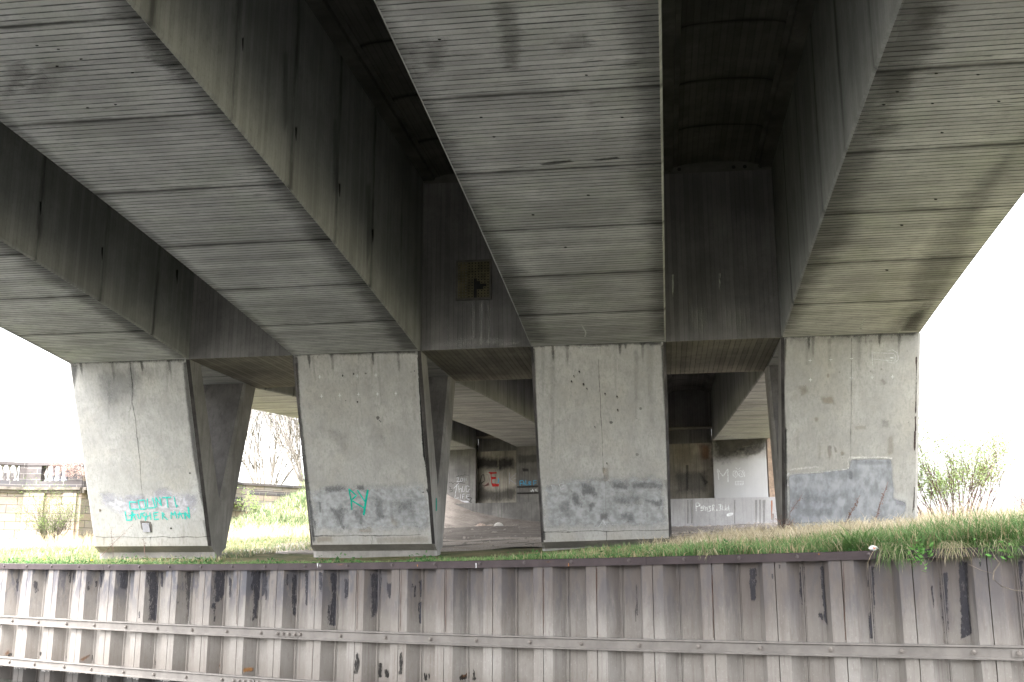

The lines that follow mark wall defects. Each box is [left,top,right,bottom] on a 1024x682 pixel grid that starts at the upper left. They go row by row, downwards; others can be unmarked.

crack [130,364,143,499]